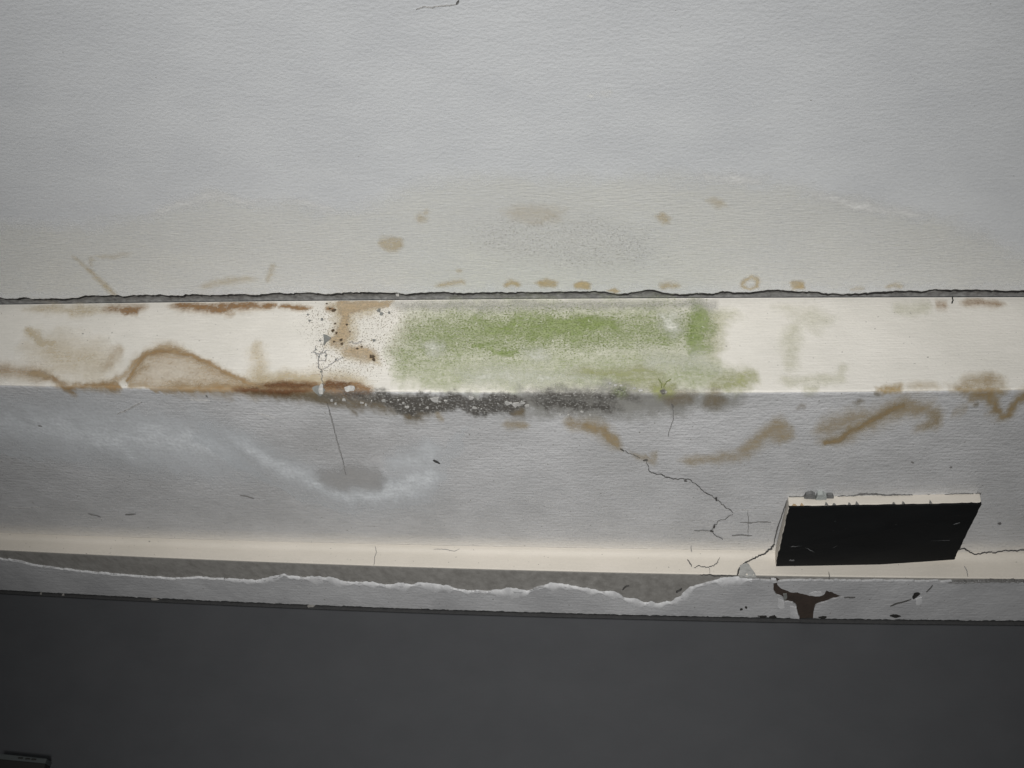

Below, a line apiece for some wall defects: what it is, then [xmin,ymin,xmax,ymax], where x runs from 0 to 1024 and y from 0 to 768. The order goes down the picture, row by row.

crack [0,289,1024,304]
water stain [0,345,441,509]
water stain [303,382,738,448]
crack [620,448,804,579]
crack [837,491,981,499]
peeling [0,557,1024,621]